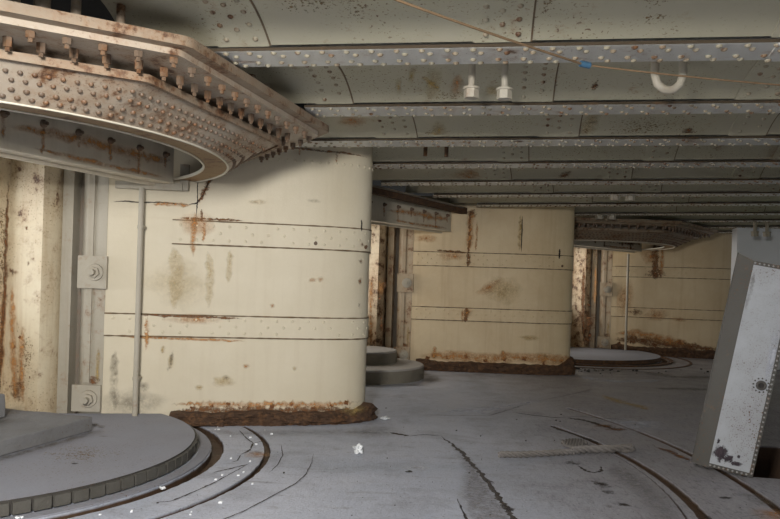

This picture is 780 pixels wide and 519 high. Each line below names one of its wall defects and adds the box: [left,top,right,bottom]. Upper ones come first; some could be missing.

corrosion [26,127,166,176]
corrosion [184,209,241,251]
corrosion [437,209,478,266]
corrosion [645,245,665,279]
corrosion [0,189,35,400]
corrosion [618,331,714,350]
crack [390,432,517,519]